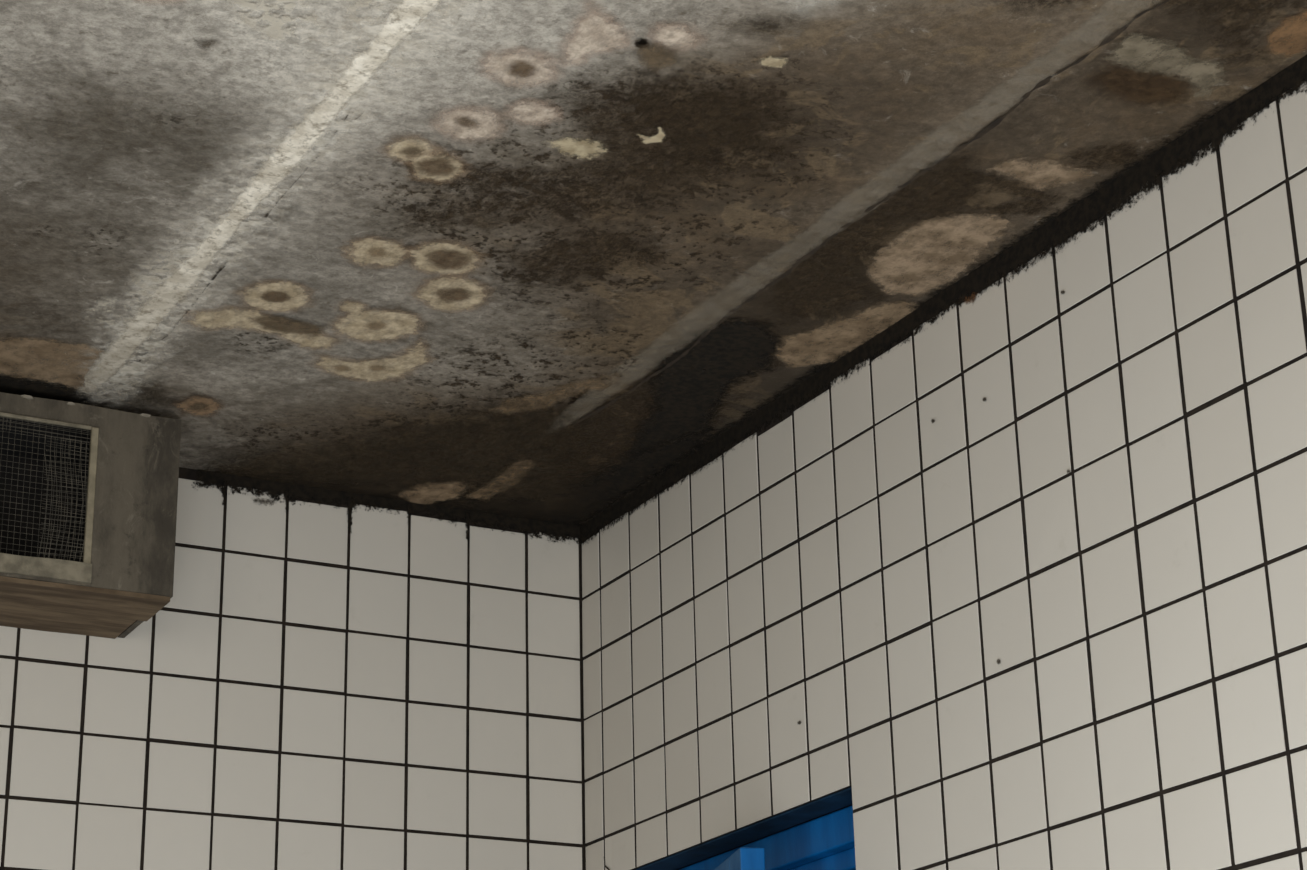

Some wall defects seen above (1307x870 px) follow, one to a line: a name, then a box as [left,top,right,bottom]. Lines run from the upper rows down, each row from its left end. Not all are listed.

water stain [0,0,1307,546]
flaking render [776,215,1009,367]